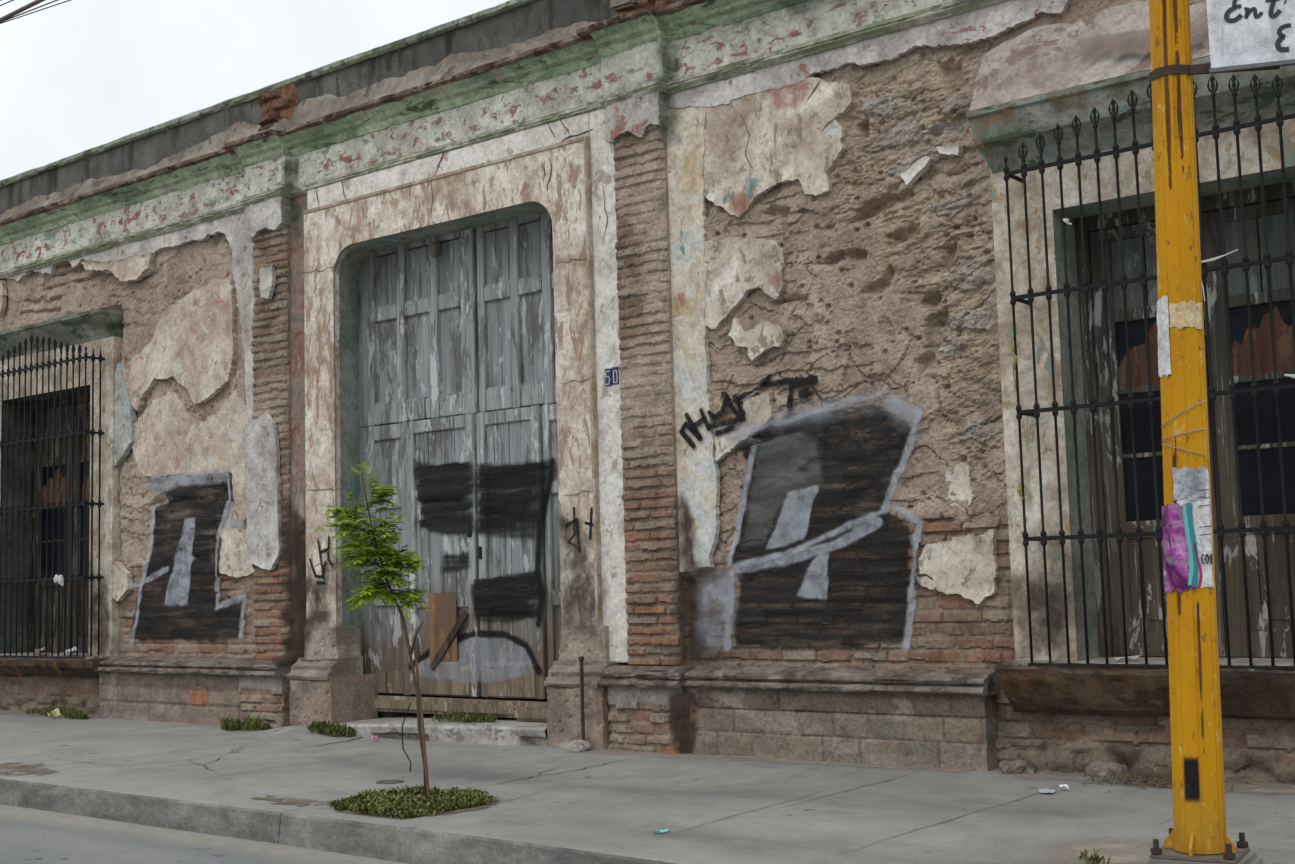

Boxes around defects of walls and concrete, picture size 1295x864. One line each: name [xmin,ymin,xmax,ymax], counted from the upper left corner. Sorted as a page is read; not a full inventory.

flaking render [1190,19,1209,43]
flaking render [0,212,283,658]
flaking render [666,0,1151,670]